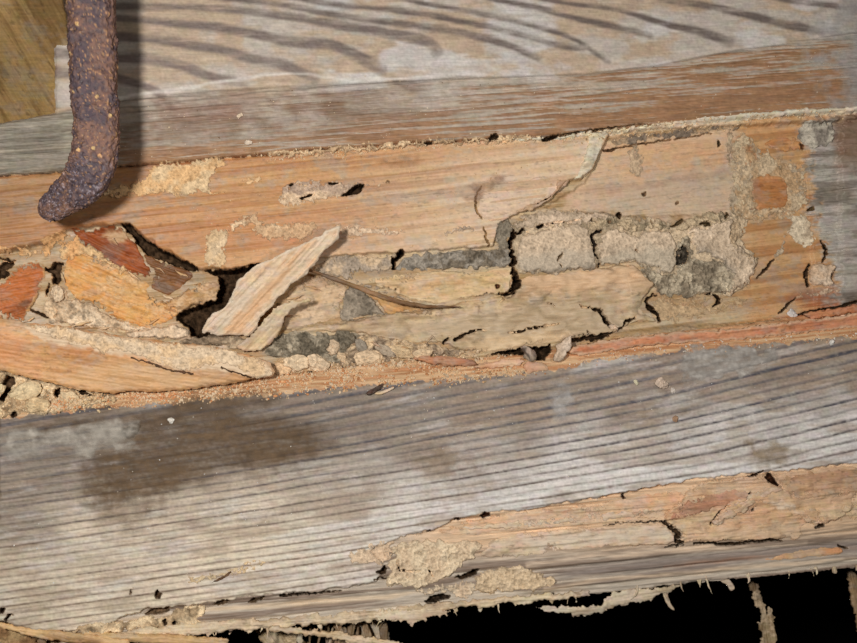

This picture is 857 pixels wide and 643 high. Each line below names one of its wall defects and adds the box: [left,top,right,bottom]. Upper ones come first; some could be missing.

corrosion [37,0,121,222]
spalling [676,245,689,265]
peeling [0,260,45,321]
spalling [120,222,260,338]
peeling [553,335,572,362]
crack [603,520,684,548]
peeling [374,607,451,627]